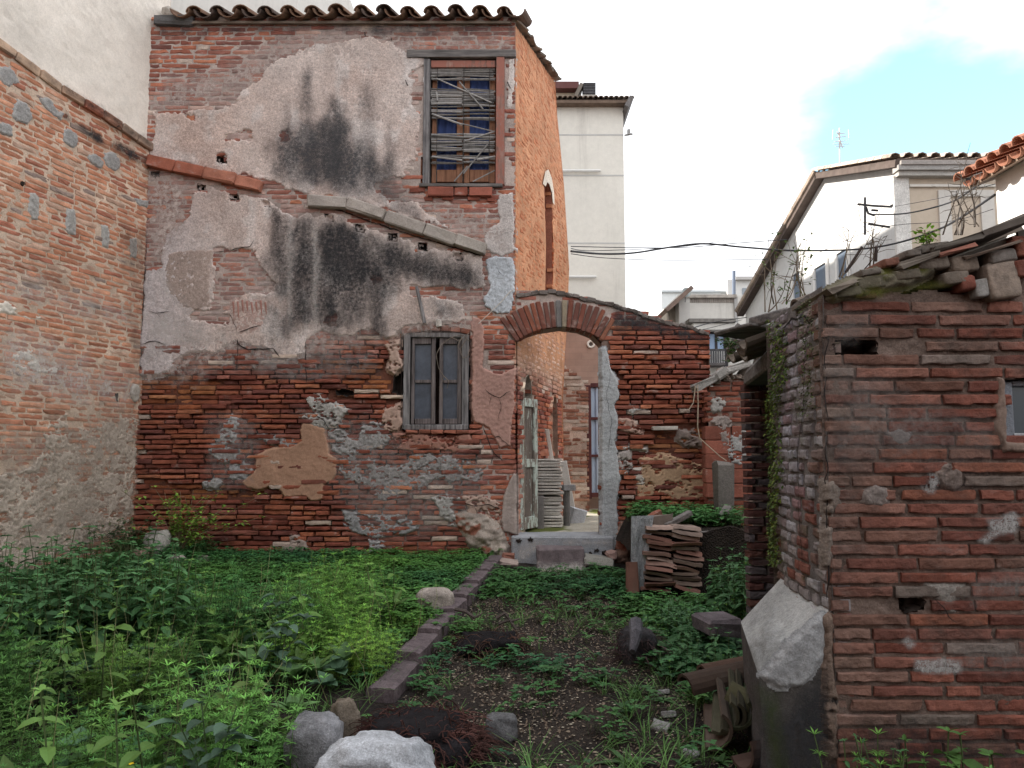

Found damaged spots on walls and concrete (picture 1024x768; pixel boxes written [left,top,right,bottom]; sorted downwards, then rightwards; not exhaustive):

flaking render [139,31,518,409]
water stain [272,100,394,196]
water stain [271,210,478,336]
flaking render [0,393,264,577]